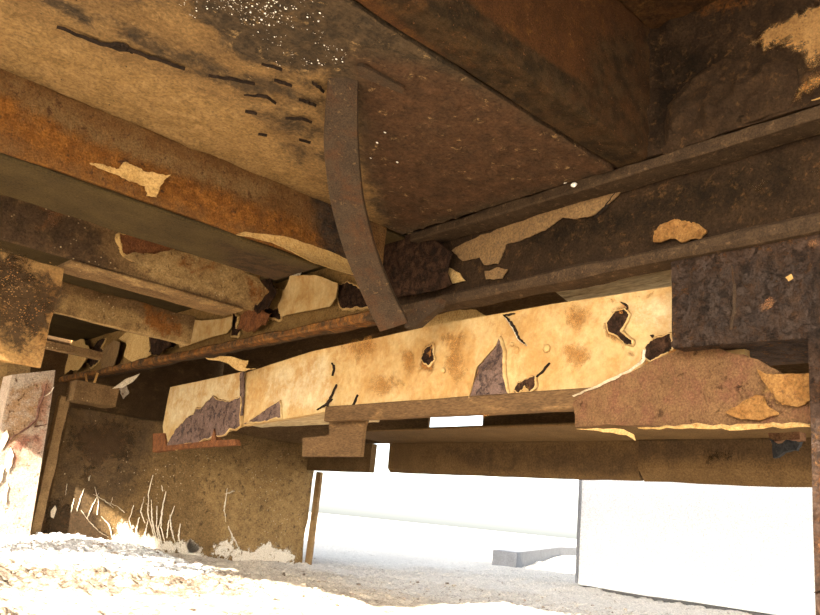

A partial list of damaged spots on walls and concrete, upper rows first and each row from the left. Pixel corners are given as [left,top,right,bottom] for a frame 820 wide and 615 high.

peeling [90,162,170,198]
leakage [0,255,33,283]
corrosion [115,232,175,262]
peeling [237,232,353,275]
peeling [452,192,621,280]
peeling [278,272,338,317]
leakage [24,303,52,334]
peeling [179,316,233,348]
peeling [206,356,256,371]
spalling [469,336,510,396]
spalling [572,332,677,397]
peeling [581,395,810,441]